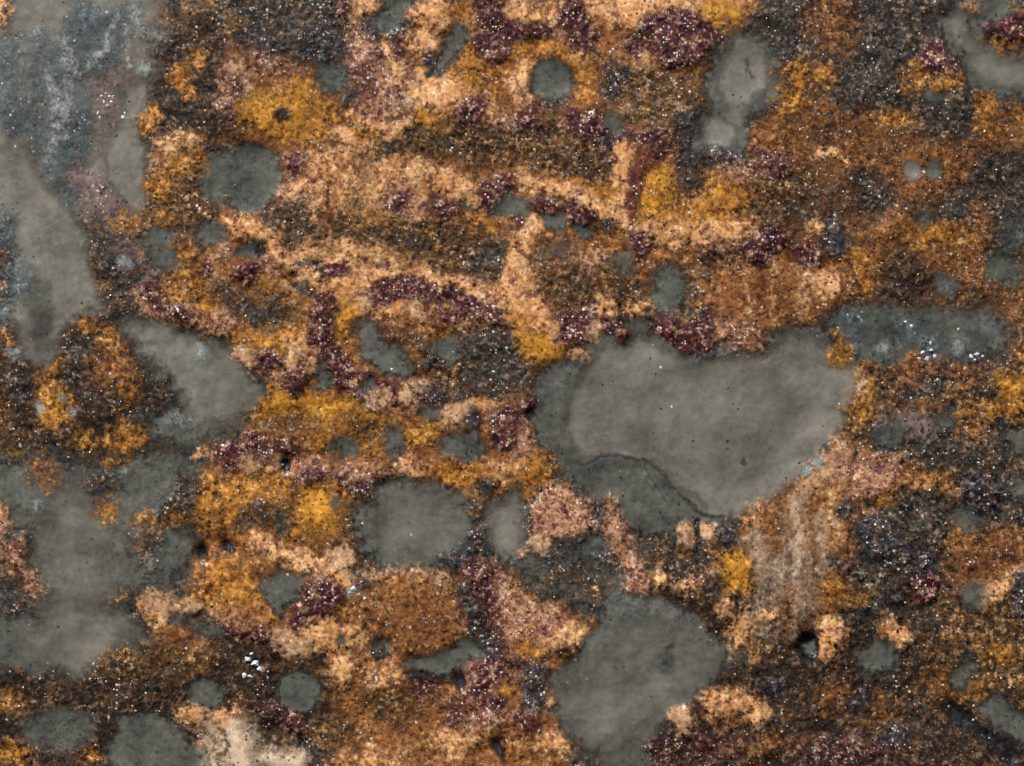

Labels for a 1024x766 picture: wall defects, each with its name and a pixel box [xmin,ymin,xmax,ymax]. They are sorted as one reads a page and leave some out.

rust [137,0,1024,516]
rust [0,304,179,465]
crack [580,433,843,527]
rust [0,455,374,766]
rust [313,565,581,766]
rust [645,536,758,633]
rust [815,681,848,718]
rust [812,576,868,660]
rust [877,613,913,649]
rust [920,668,986,723]
rust [941,521,1024,611]
rust [977,642,1015,664]